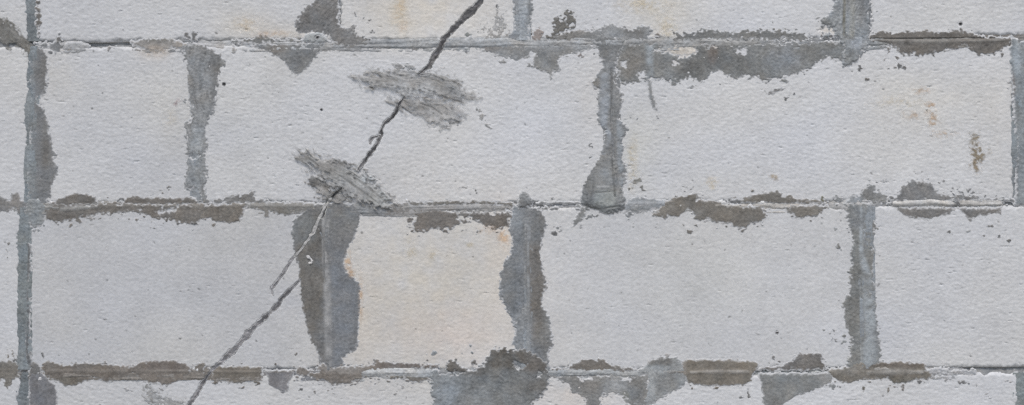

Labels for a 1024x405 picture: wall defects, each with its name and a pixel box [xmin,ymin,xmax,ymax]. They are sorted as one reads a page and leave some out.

crack [417,0,484,75]
crack [187,97,405,405]